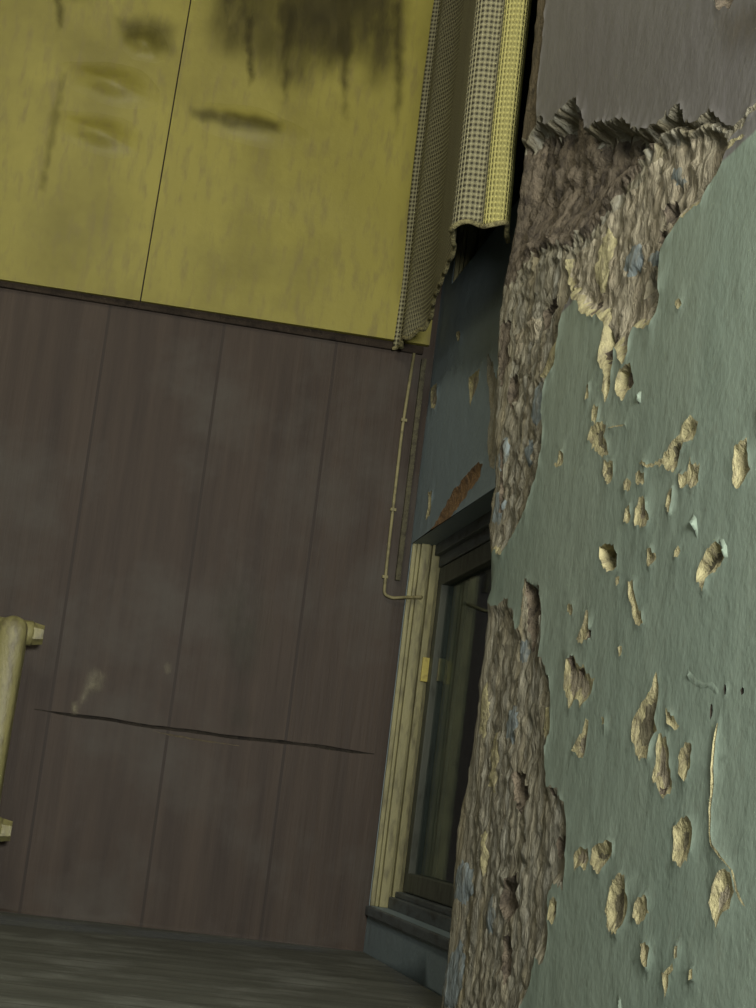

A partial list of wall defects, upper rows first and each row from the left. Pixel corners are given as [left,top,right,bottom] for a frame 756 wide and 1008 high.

water stain [263,0,399,64]
flaking render [426,0,756,555]
flaking render [599,543,643,626]
peeling [689,514,728,592]
flaking render [441,578,612,1008]